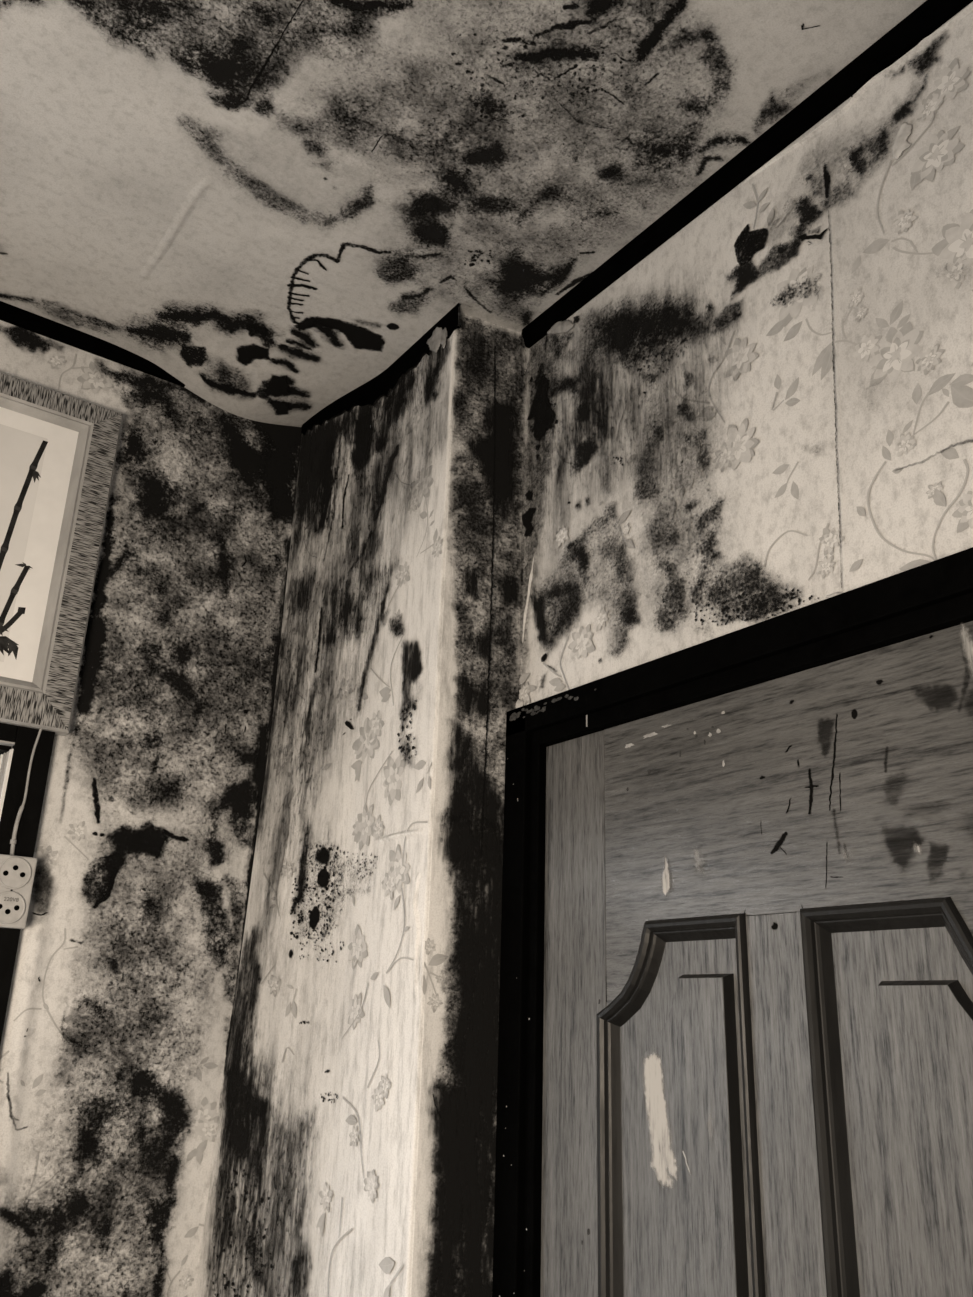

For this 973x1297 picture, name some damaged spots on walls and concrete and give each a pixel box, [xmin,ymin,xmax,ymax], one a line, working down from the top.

damp [0,0,750,415]
damp [754,91,792,133]
damp [770,278,820,306]
damp [773,34,945,247]
damp [0,337,448,1297]
damp [427,291,819,1297]